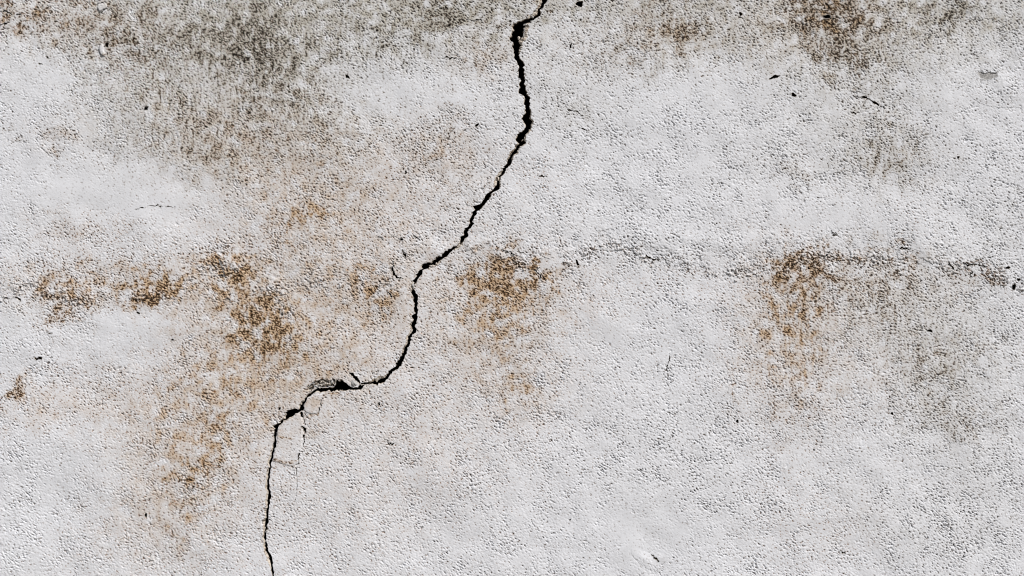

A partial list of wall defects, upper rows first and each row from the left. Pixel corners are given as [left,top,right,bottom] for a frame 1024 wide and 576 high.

crack [261,0,547,576]